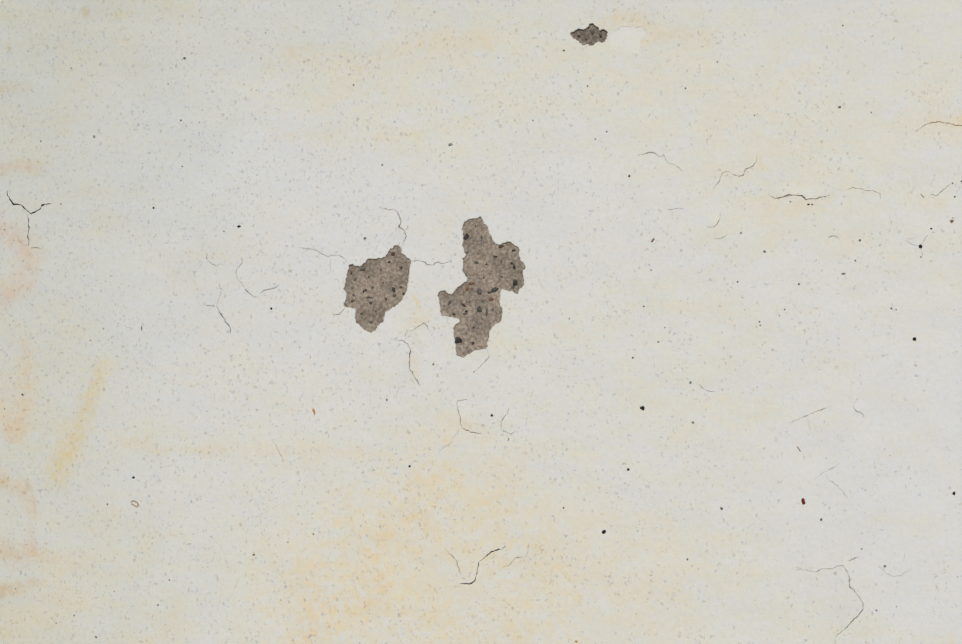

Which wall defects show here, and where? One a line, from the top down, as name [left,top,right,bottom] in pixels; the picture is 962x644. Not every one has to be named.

spalling [570,23,608,46]
crack [7,190,49,248]
crack [770,181,881,200]
peeling [343,245,411,333]
peeling [437,216,526,358]
crack [450,546,529,587]